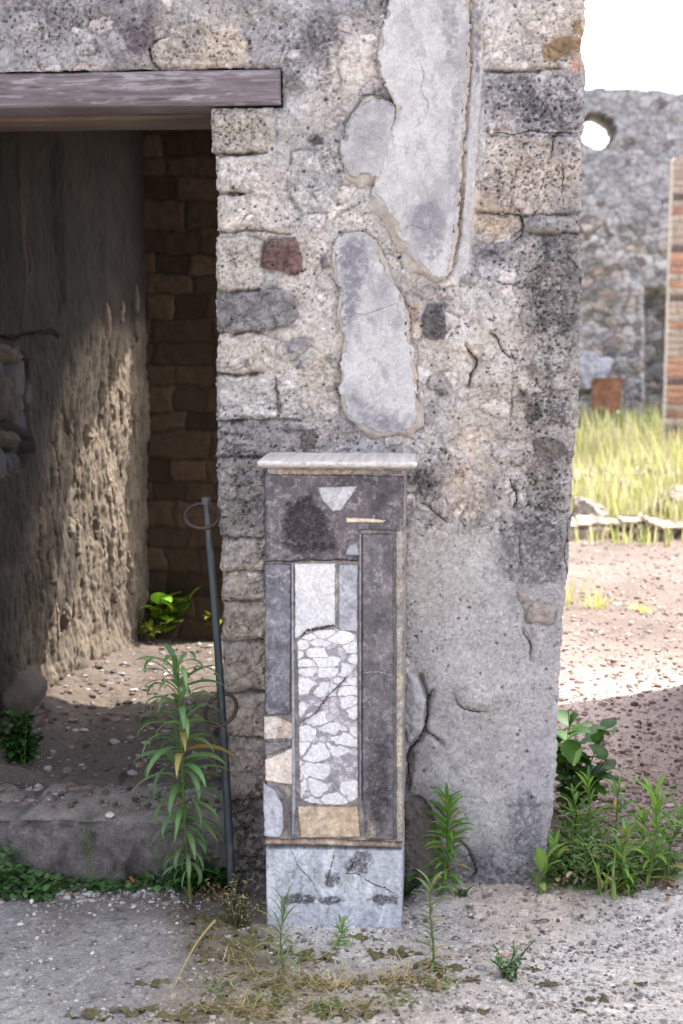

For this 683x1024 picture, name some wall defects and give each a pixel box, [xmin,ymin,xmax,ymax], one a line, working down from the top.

crack [493,130,583,205]
crack [501,213,524,241]
crack [406,676,441,788]
crack [275,785,393,893]